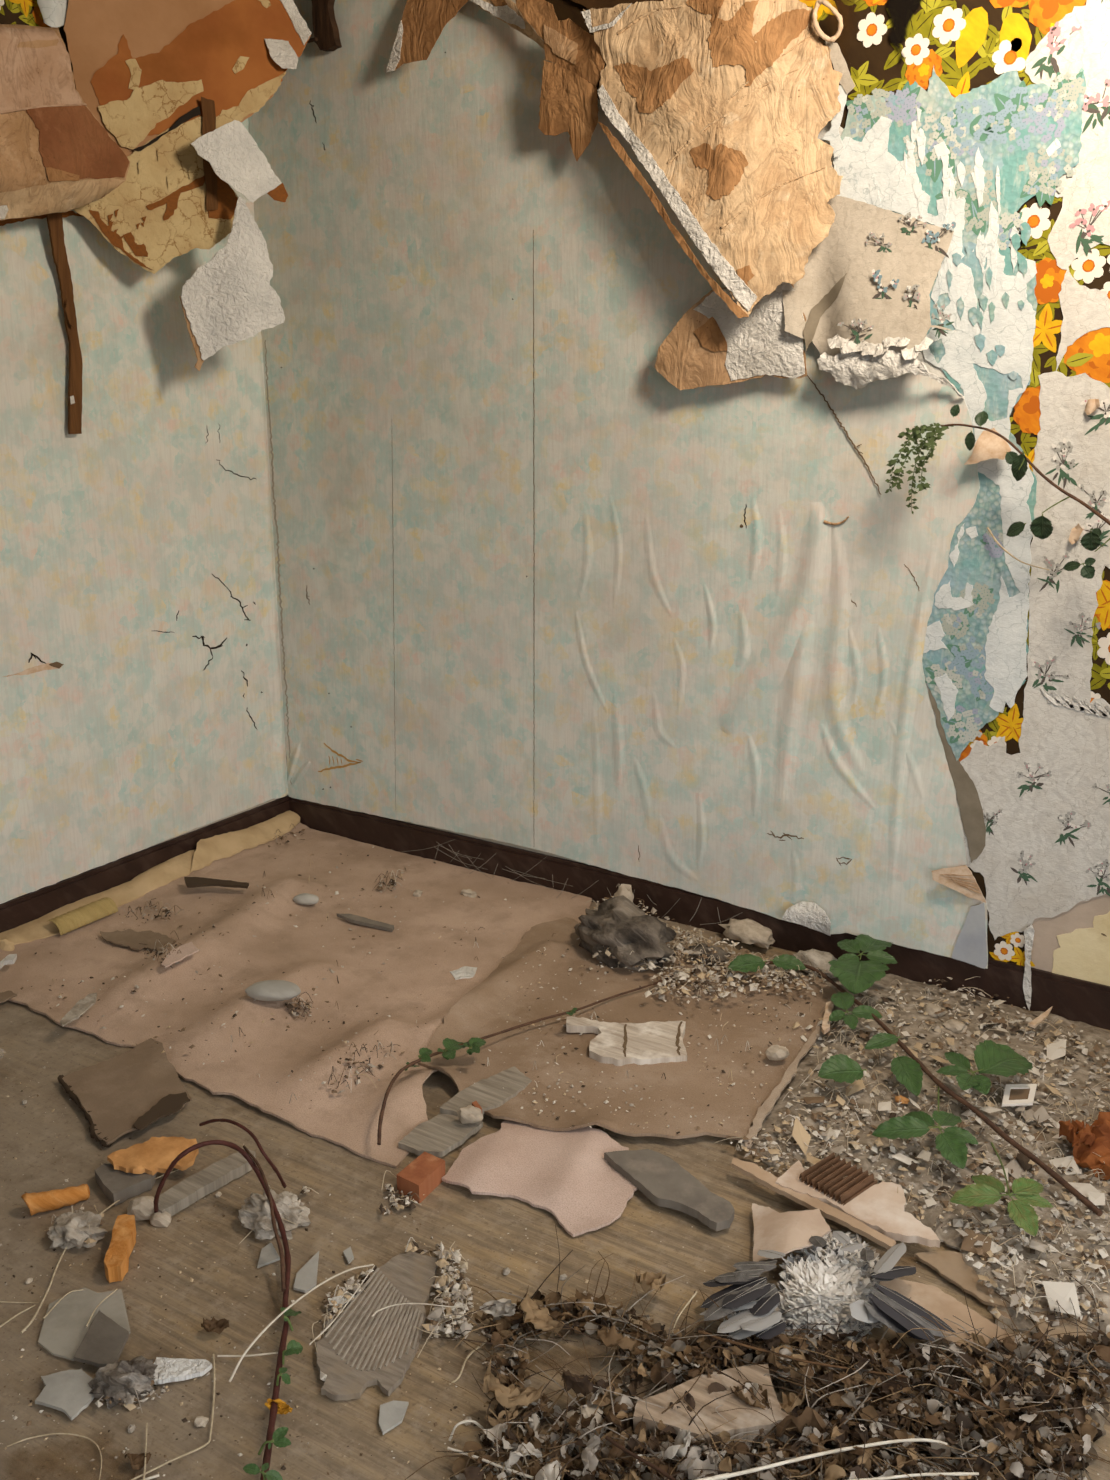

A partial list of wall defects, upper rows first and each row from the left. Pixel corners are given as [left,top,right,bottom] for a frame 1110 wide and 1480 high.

peeling [572,0,663,9]
peeling [1046,138,1061,157]
peeling [827,107,1037,713]
crack [158,574,257,729]
peeling [934,673,958,721]
flaking render [1052,911,1110,986]